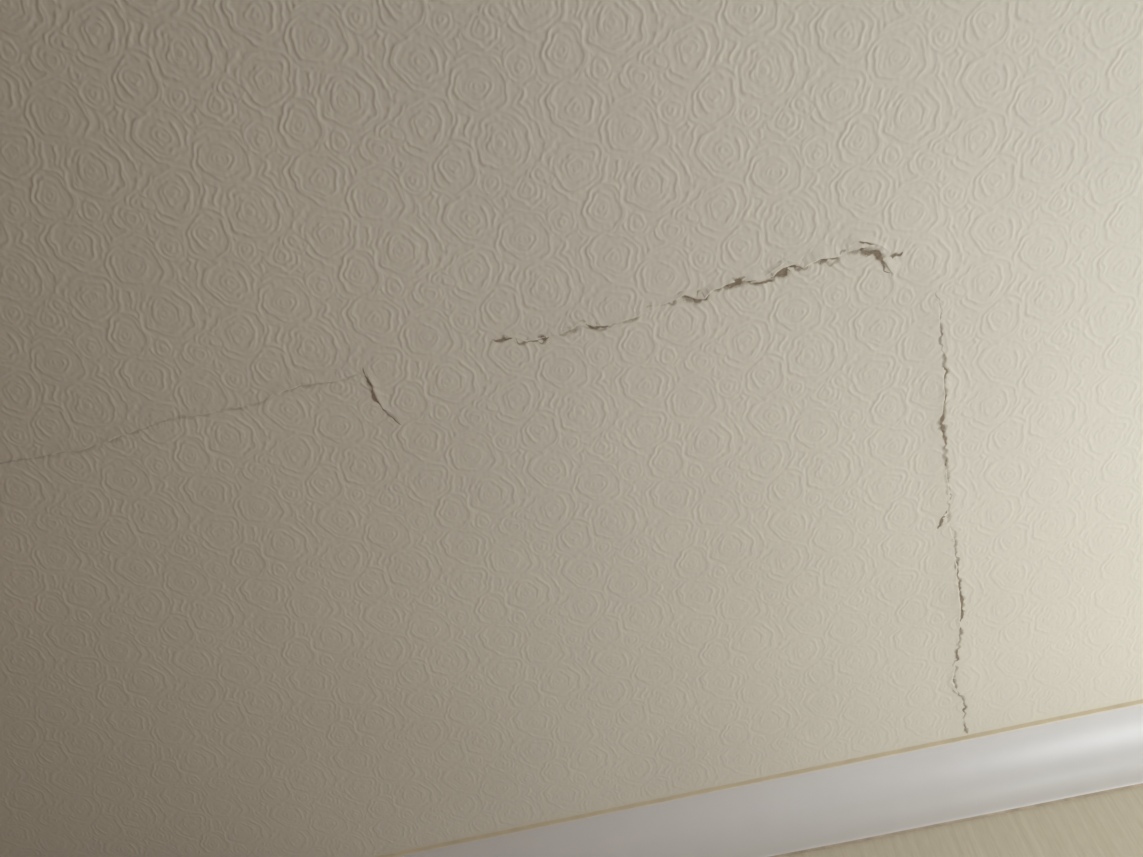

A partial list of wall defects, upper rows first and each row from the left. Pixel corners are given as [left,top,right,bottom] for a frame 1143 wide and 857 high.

crack [486,234,904,344]
crack [930,290,966,736]